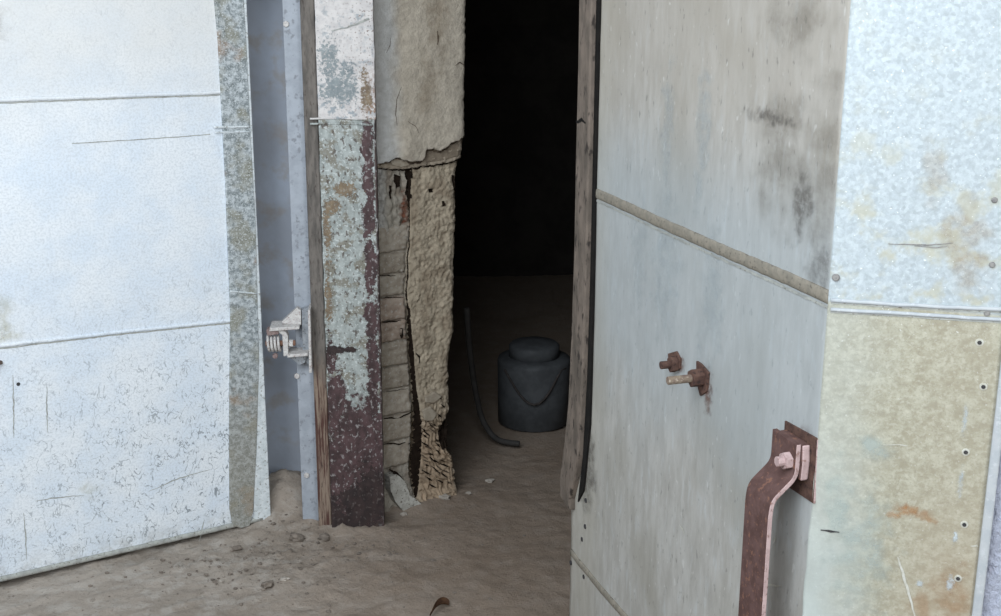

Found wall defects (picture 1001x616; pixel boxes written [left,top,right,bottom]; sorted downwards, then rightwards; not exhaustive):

flaking render [316,25,464,527]